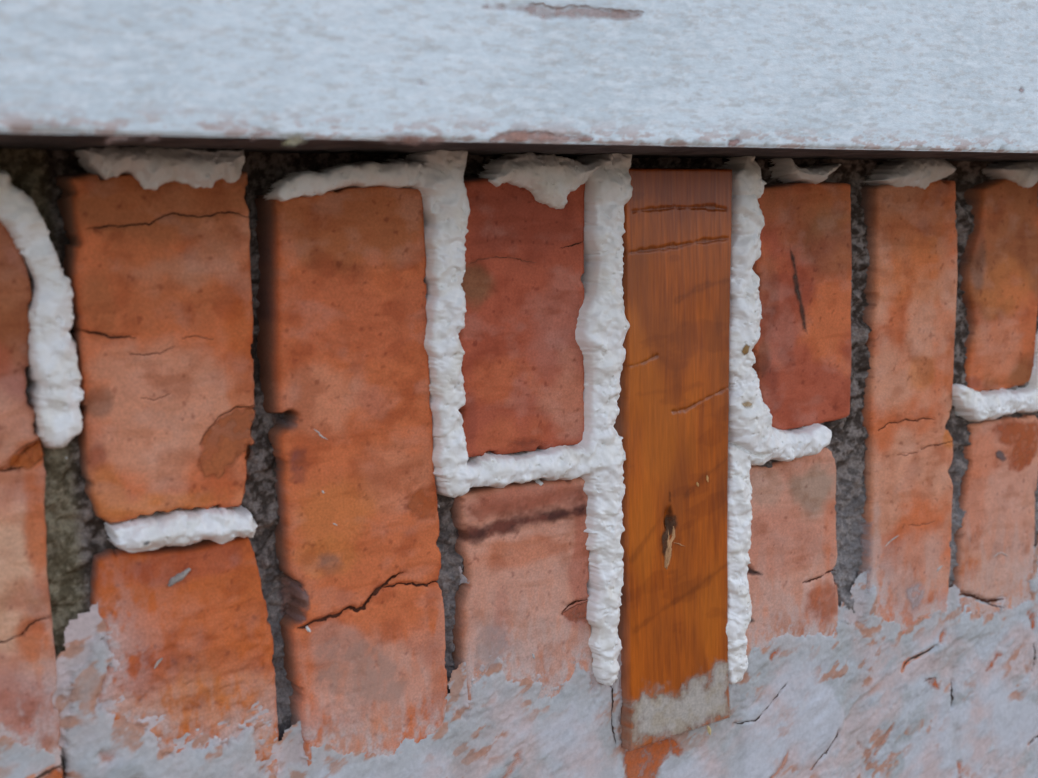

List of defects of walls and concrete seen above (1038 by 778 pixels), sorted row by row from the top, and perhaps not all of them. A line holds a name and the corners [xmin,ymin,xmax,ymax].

crack [87,211,249,229]
crack [0,443,42,472]
spalling [1,439,43,470]
spalling [199,405,255,480]
spalling [280,573,309,622]
crack [297,572,437,629]
spalling [563,601,588,622]
crack [903,646,934,668]
peeling [38,765,63,778]